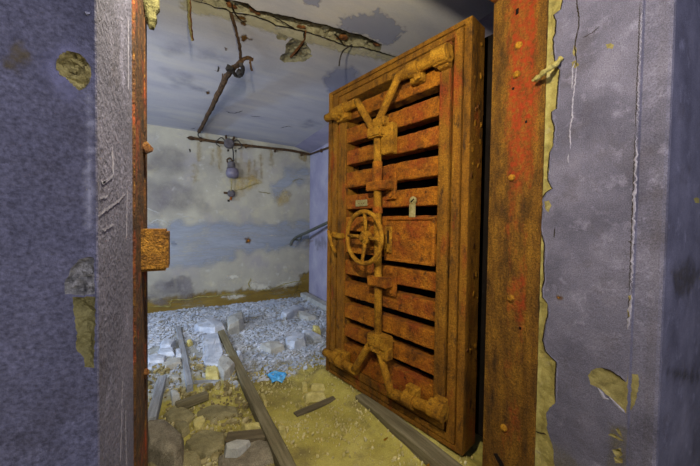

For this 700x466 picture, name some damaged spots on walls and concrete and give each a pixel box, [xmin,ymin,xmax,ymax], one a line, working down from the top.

spalling [276,30,312,63]
peeling [340,8,405,45]
spalling [48,48,91,96]
crack [567,0,596,163]
spalling [535,0,564,466]
spalling [64,257,96,368]
damp [148,272,309,313]
peeling [588,368,639,413]